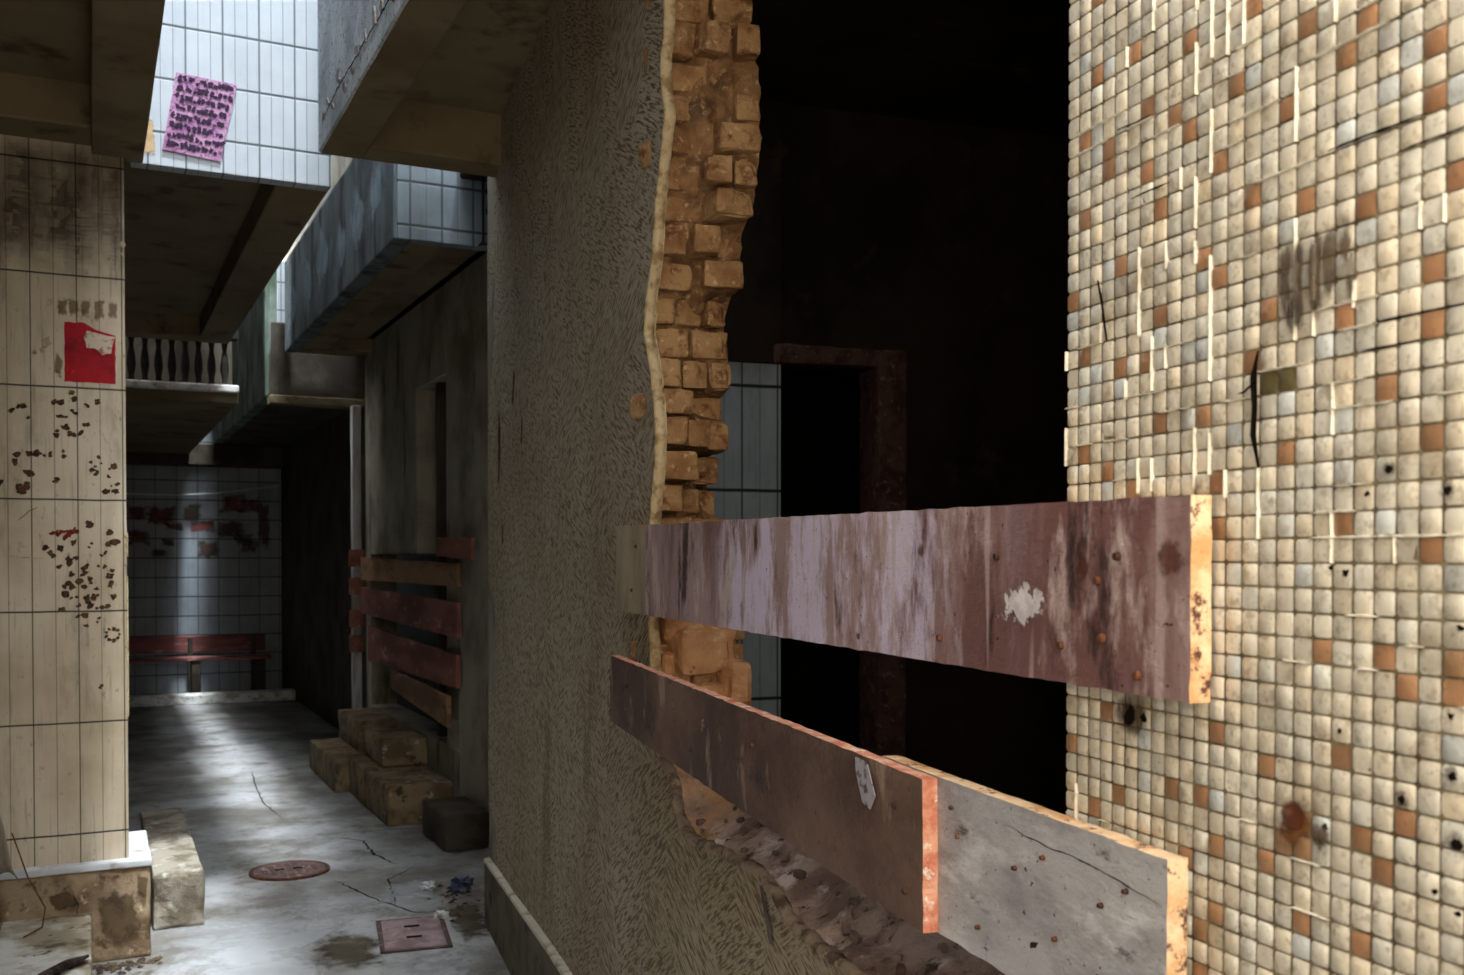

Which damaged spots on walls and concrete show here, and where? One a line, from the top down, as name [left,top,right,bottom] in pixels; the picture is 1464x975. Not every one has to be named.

spalling [630,0,762,525]
crack [1237,351,1260,468]
spalling [1383,463,1395,475]
spalling [1442,480,1453,496]
spalling [1117,698,1147,734]
spalling [1445,764,1458,782]
spalling [1395,791,1408,807]
spalling [1447,832,1464,856]